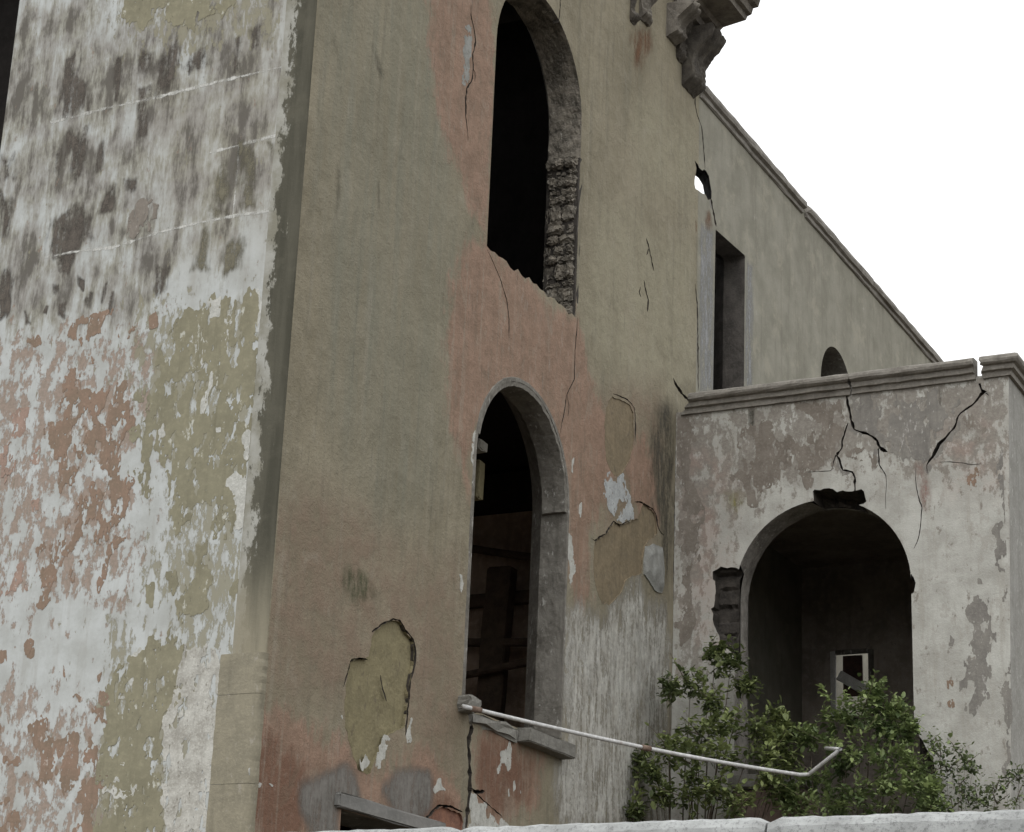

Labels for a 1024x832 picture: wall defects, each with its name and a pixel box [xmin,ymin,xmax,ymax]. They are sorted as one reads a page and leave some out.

damp [59,53,89,116]
damp [138,41,205,137]
crack [465,16,476,133]
damp [0,269,12,320]
damp [51,179,137,311]
flaking render [542,156,582,316]
peeling [730,399,878,513]
crack [816,396,887,505]
crack [914,383,989,548]
peeling [0,286,262,832]
flaking render [711,567,743,660]
crack [426,724,501,829]